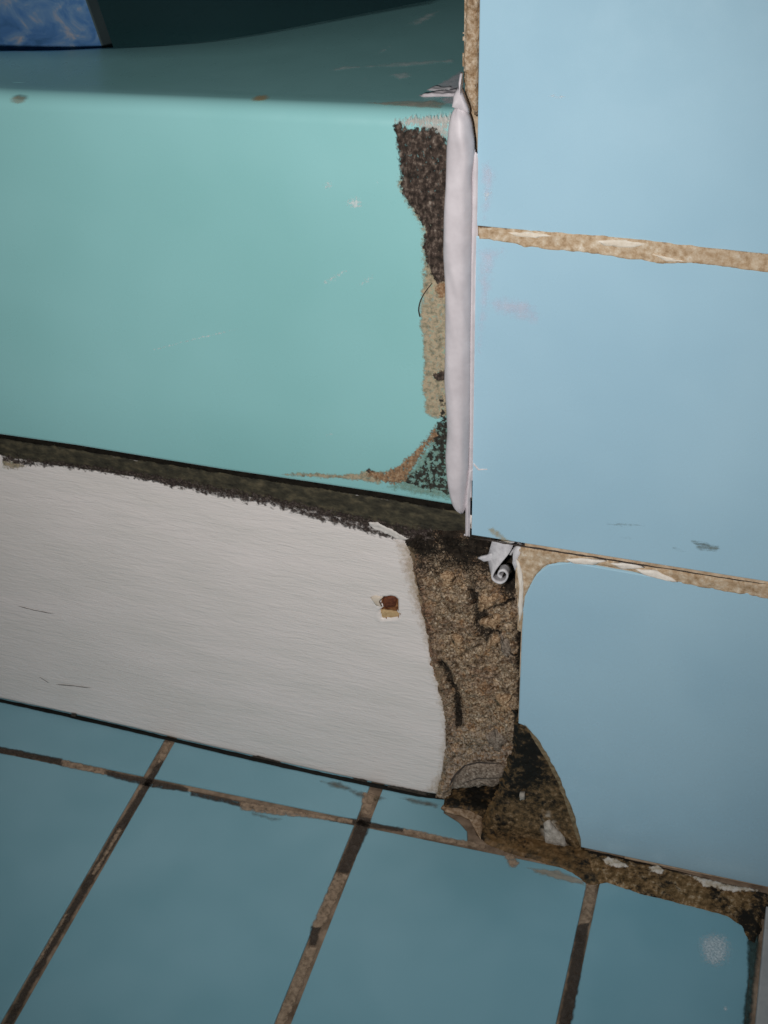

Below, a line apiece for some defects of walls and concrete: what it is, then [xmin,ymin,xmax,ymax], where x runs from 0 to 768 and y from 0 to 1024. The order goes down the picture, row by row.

water stain [0,113,471,569]
peeling [477,593,502,649]
peeling [516,558,524,622]
spalling [441,694,604,888]